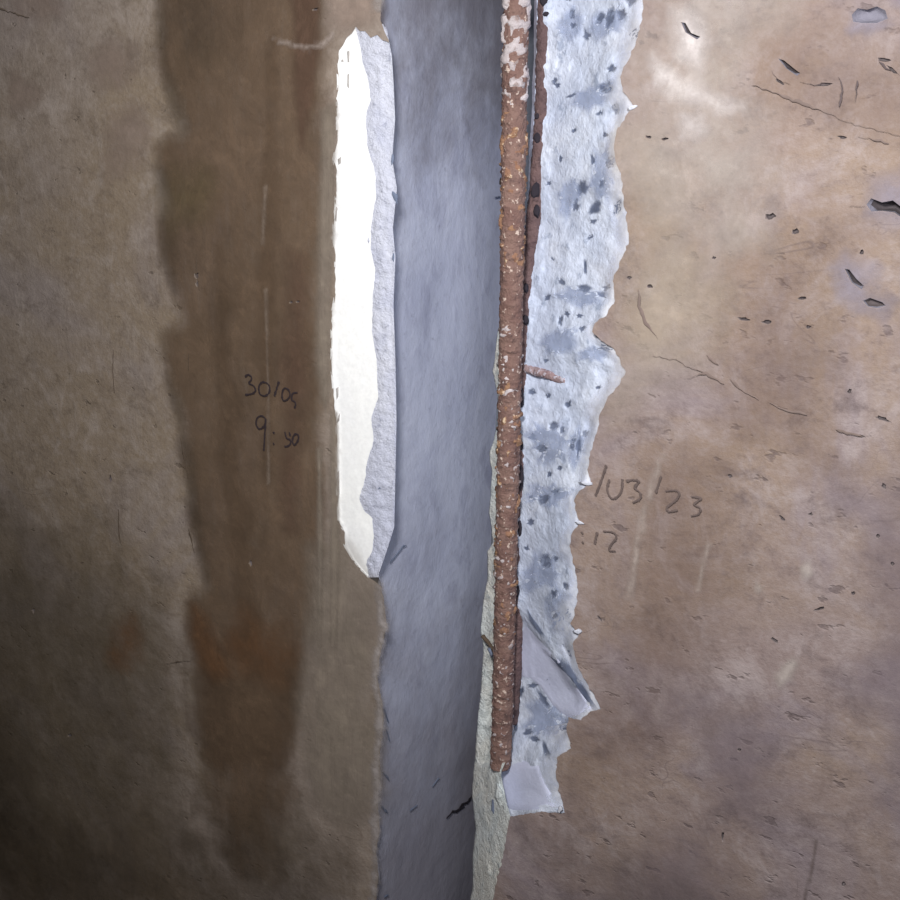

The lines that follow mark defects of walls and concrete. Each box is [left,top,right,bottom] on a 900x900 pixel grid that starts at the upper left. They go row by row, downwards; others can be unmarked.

water stain [162,0,375,868]
peeling [330,24,398,900]
corrosion [531,182,540,218]
spalling [470,0,643,900]
crack [752,72,899,144]